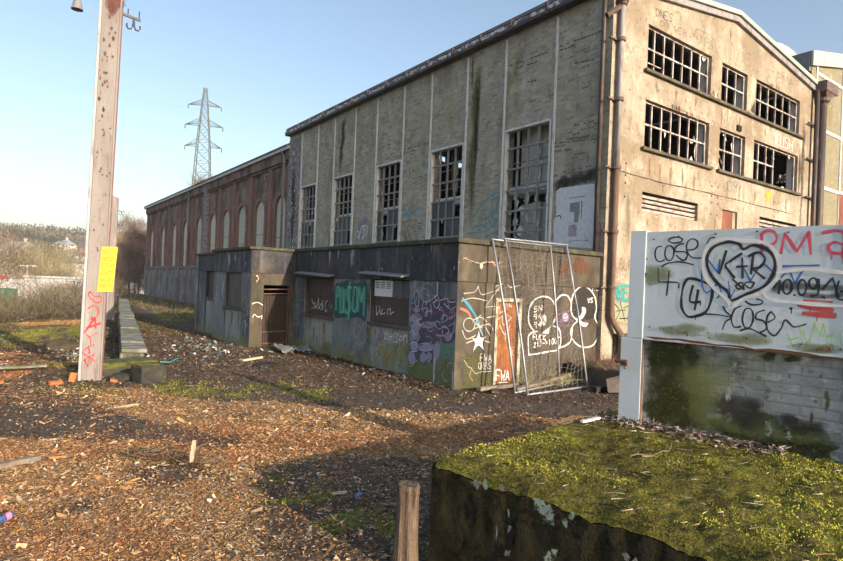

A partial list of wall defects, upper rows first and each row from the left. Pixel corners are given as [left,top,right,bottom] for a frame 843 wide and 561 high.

corrosion [106,0,126,17]
leakage [468,60,481,213]
peeling [288,149,300,248]